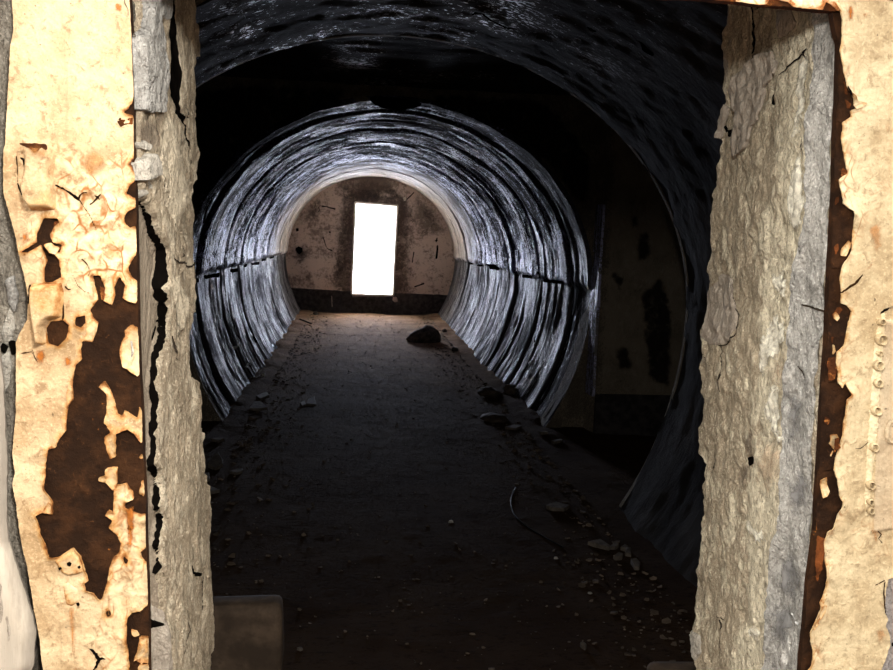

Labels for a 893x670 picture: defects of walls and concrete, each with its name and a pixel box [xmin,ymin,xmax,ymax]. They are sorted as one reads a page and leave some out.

crack [169,0,194,177]
corrosion [22,218,61,282]
crack [55,185,101,228]
corrosion [36,254,146,600]
crack [138,201,195,580]
corrosion [805,303,851,631]
spalling [882,578,893,670]